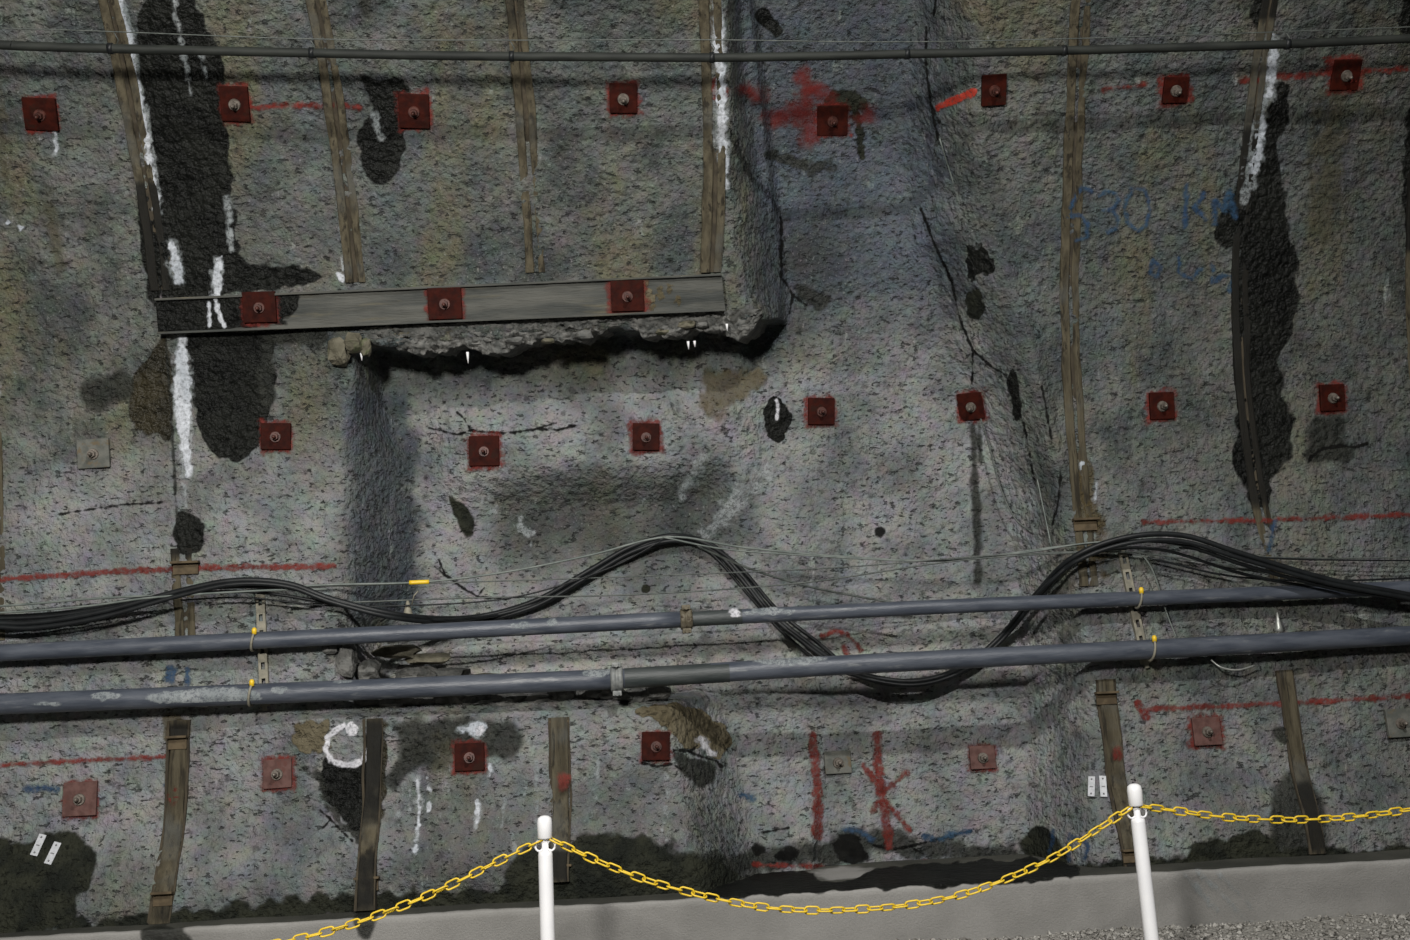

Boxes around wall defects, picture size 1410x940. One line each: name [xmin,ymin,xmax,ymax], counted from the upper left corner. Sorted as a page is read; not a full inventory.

leakage [1397,0,1410,34]
leakage [357,75,410,185]
leakage [1401,108,1410,227]
leakage [81,0,345,554]
spalling [360,308,767,358]
crack [919,207,1062,525]
leakage [1214,37,1353,507]
leakage [0,826,1123,940]
leakage [1150,773,1410,902]